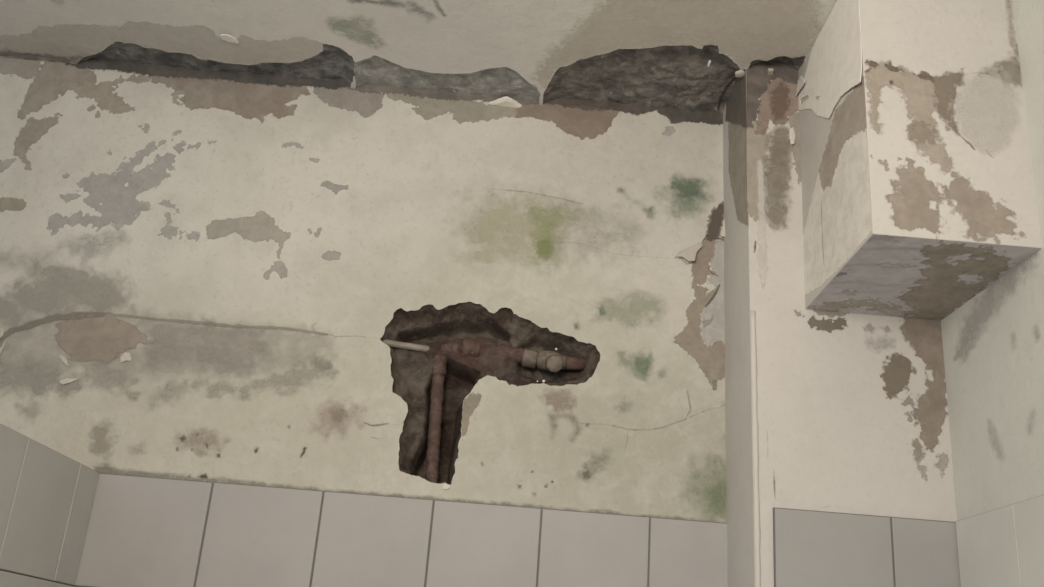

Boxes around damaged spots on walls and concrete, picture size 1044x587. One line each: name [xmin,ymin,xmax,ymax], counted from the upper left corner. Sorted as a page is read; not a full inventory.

spalling [0,0,963,391]
spalling [380,302,600,490]